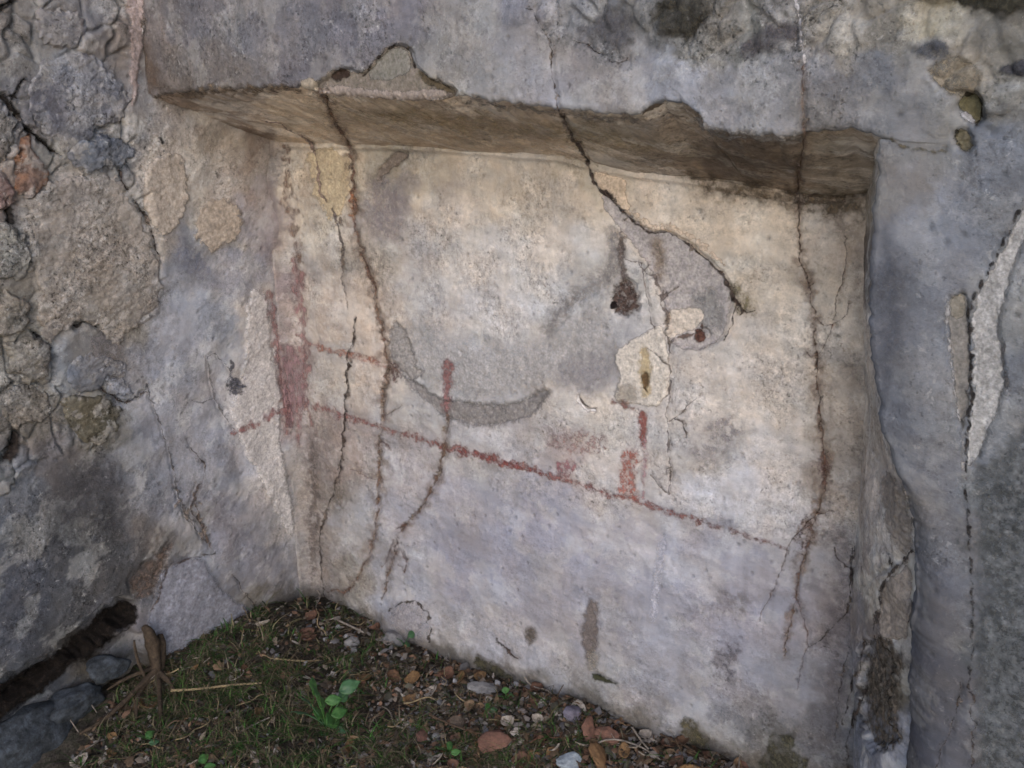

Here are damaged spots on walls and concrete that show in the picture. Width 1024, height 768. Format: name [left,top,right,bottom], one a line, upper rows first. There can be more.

flaking render [126,0,144,106]
flaking render [142,152,190,235]
flaking render [307,147,352,219]
crack [265,88,450,599]
flaking render [376,151,409,180]
flaking render [155,43,663,123]
flaking render [389,171,731,426]
crack [526,8,755,495]
crack [760,0,915,768]
flaking render [944,209,1024,473]
flaking render [963,489,975,689]